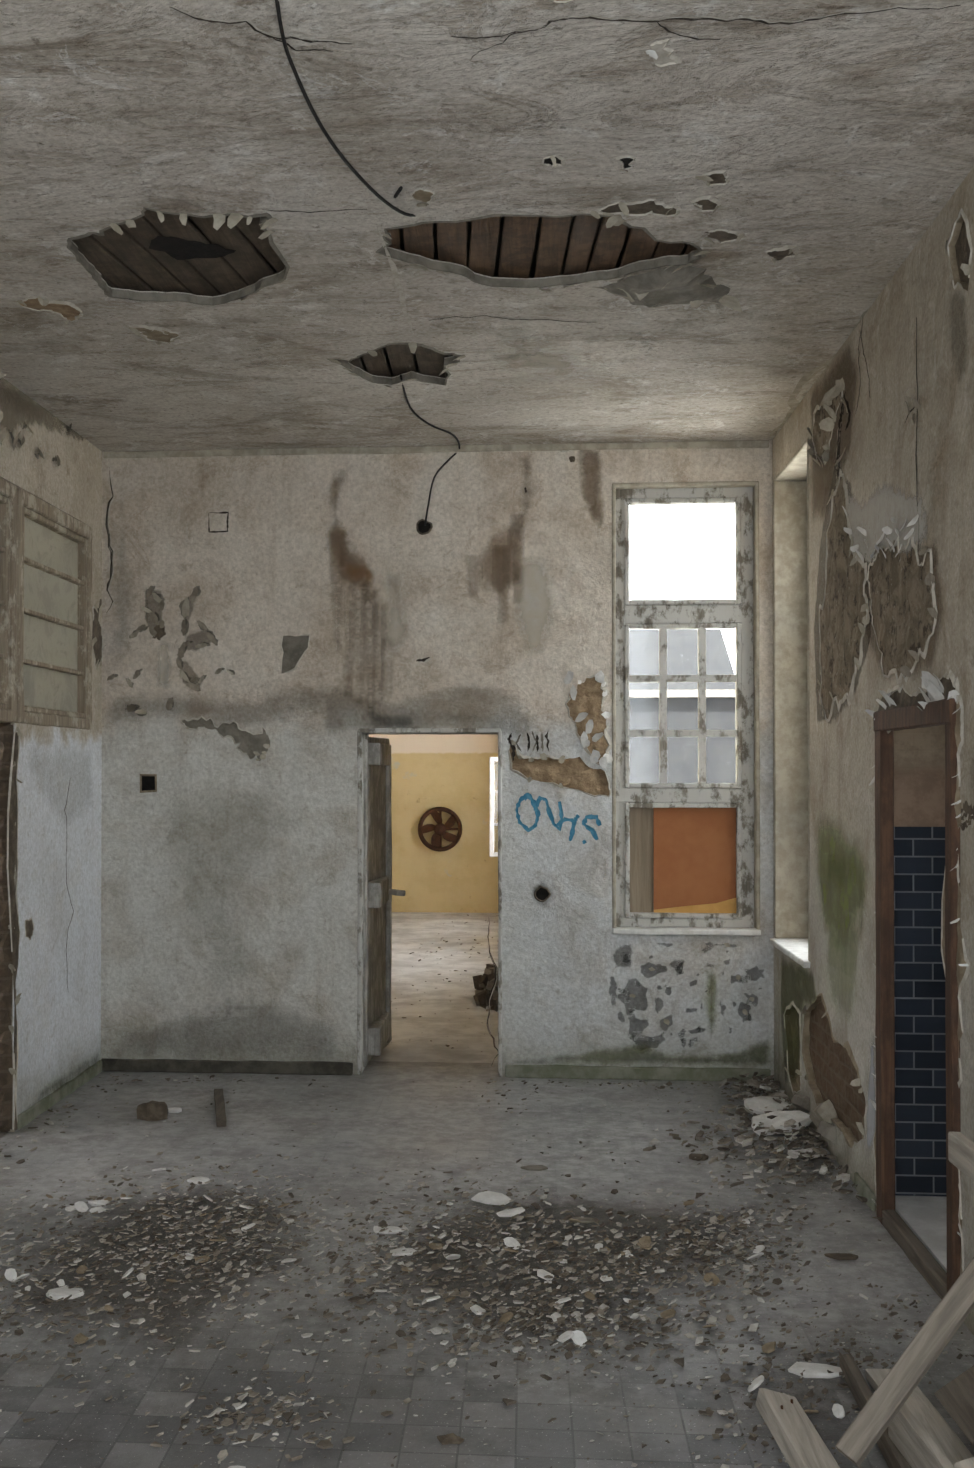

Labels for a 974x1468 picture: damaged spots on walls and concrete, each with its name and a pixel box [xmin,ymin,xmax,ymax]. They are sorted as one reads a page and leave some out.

crack [451,3,964,61]
spalling [66,207,290,306]
spalling [375,170,748,292]
spalling [327,342,466,388]
peeling [129,585,270,761]
spalling [281,634,310,674]
leakage [332,527,367,583]
leakage [484,536,544,643]
peeling [807,377,964,828]
peeling [508,671,613,797]
peeling [609,943,764,1048]
spalling [783,993,876,1204]